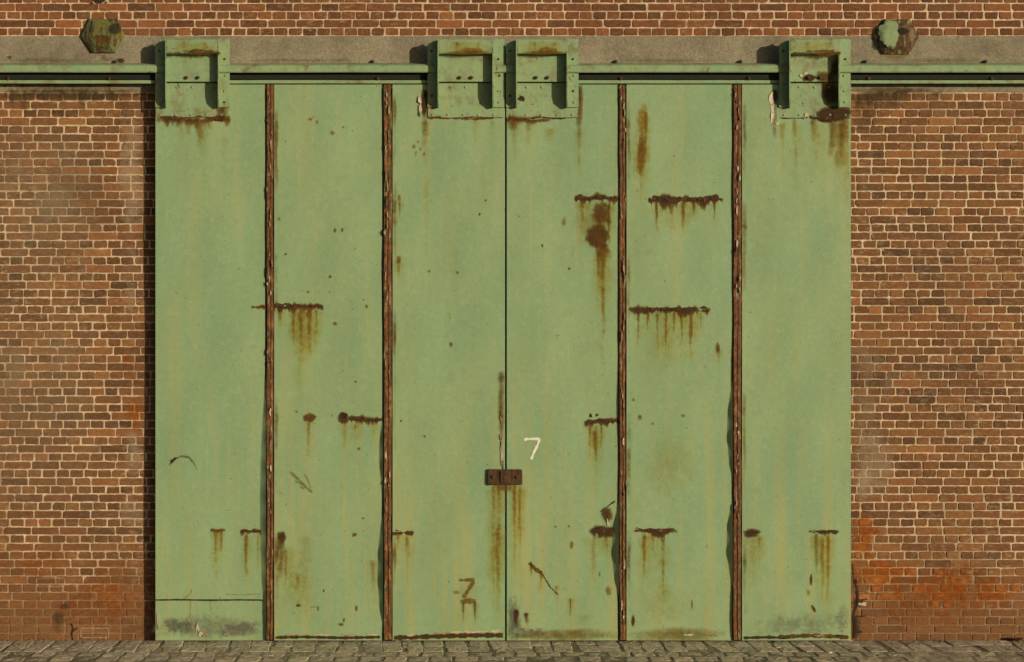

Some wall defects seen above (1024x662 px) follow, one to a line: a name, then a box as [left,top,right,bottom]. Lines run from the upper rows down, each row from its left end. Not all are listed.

corrosion [782,50,851,126]
corrosion [160,109,230,123]
peeling [769,91,779,125]
corrosion [649,194,722,212]
corrosion [575,194,618,265]
corrosion [252,303,323,316]
corrosion [630,306,709,329]
corrosion [339,413,383,423]
corrosion [585,413,619,426]
corrosion [636,527,674,537]